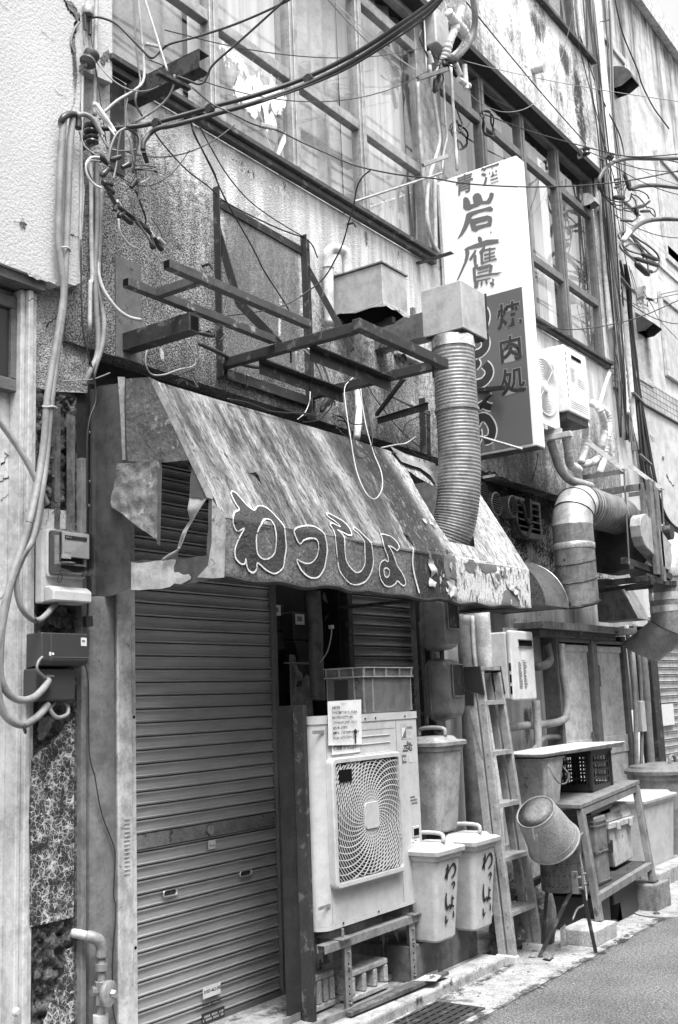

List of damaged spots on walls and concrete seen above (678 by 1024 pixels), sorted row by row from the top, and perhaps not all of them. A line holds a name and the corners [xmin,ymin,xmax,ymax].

damp [531,12,545,43]
damp [538,45,586,146]
peeling [428,549,528,607]